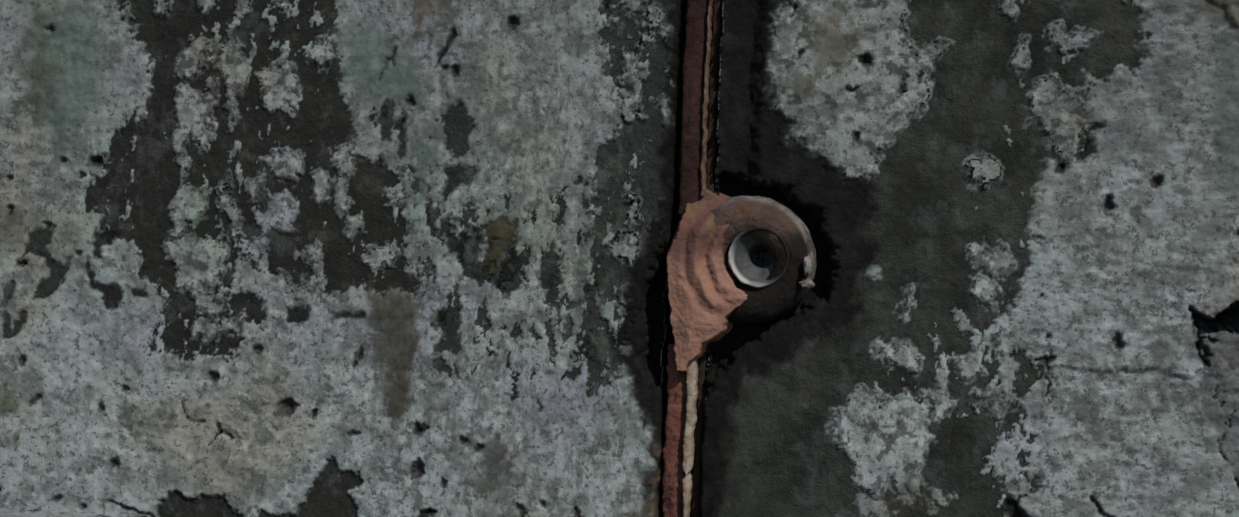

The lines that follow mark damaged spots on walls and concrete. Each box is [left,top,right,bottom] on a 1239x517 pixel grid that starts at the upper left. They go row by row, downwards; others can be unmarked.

damp [370,288,418,419]
crack [1035,356,1056,369]
spalling [1188,300,1239,477]
peeling [157,491,243,517]
peeling [259,458,363,517]
crack [1001,499,1027,517]